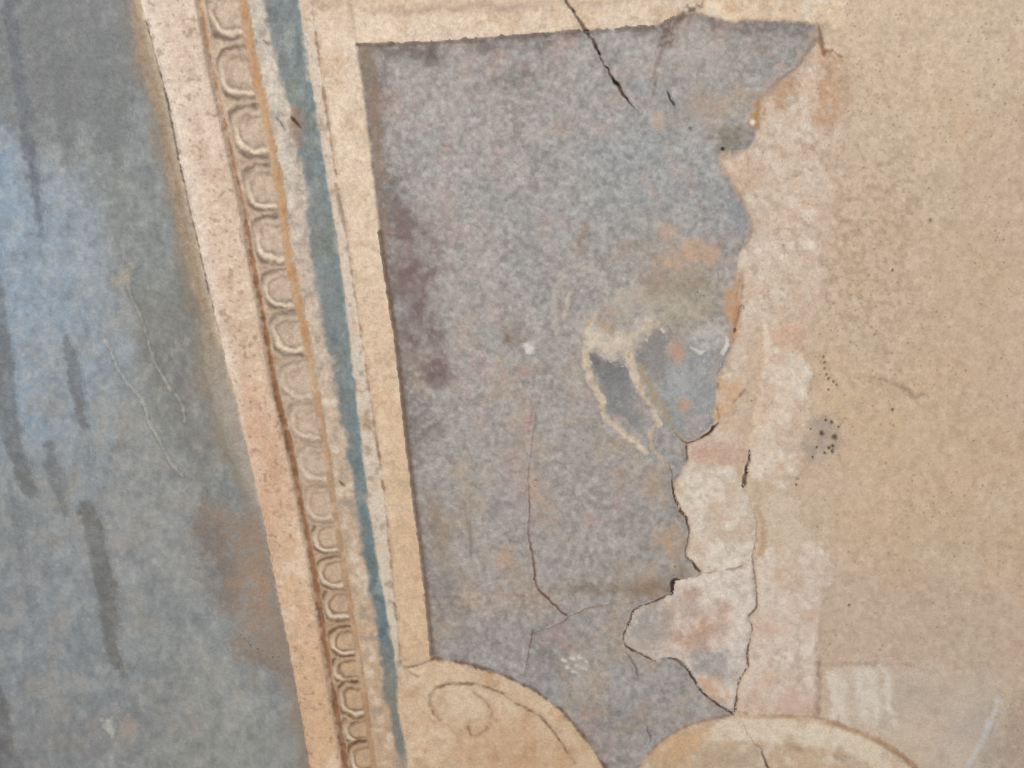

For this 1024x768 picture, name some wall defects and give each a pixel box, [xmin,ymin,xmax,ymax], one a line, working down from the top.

crack [563,0,713,115]
flaking render [692,0,854,52]
flaking render [578,64,862,574]
leakage [795,408,846,472]
crack [459,374,771,768]